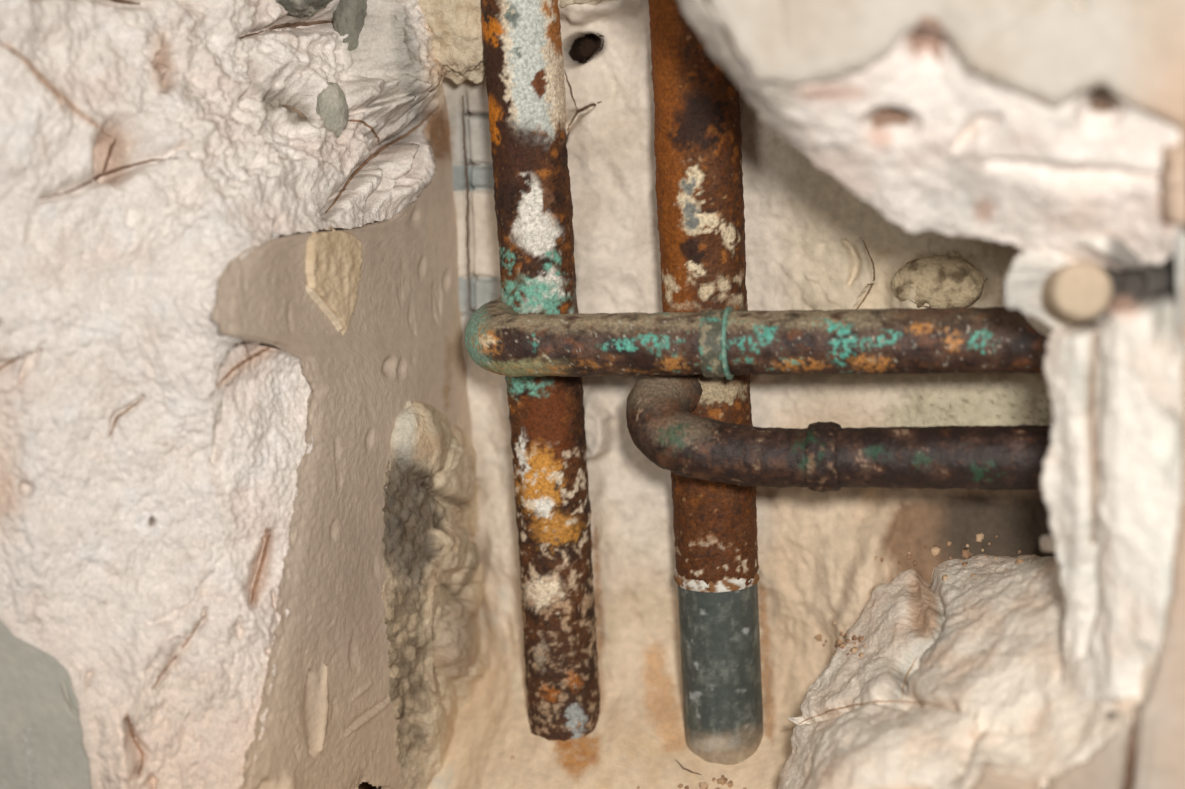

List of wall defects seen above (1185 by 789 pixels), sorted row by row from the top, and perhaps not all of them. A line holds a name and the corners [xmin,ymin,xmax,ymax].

crack [0,42,178,199]
crack [111,0,140,8]
flaking render [0,0,447,789]
crack [250,535,271,604]
spalling [381,400,485,789]
flaking render [678,0,1185,789]